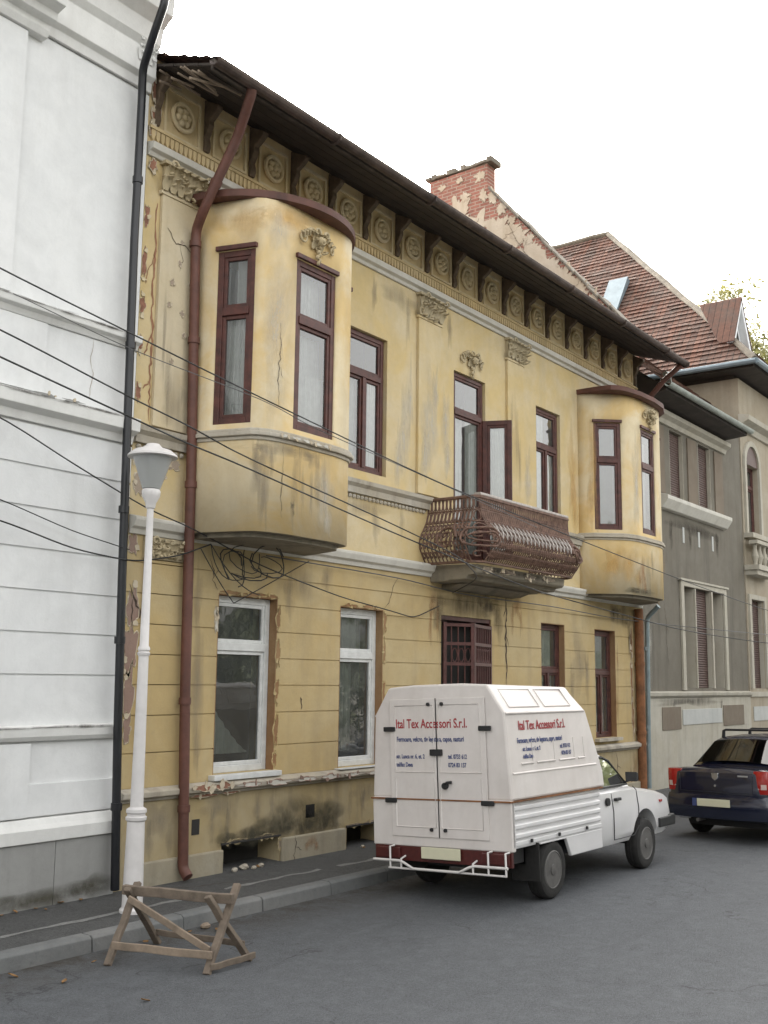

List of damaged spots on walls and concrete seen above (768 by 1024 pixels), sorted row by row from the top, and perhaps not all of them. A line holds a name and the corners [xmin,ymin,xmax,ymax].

peeling [139,245,148,319]
peeling [143,204,151,228]
crack [143,203,189,419]
peeling [438,171,614,312]
peeling [122,580,140,745]
peeling [191,589,375,800]